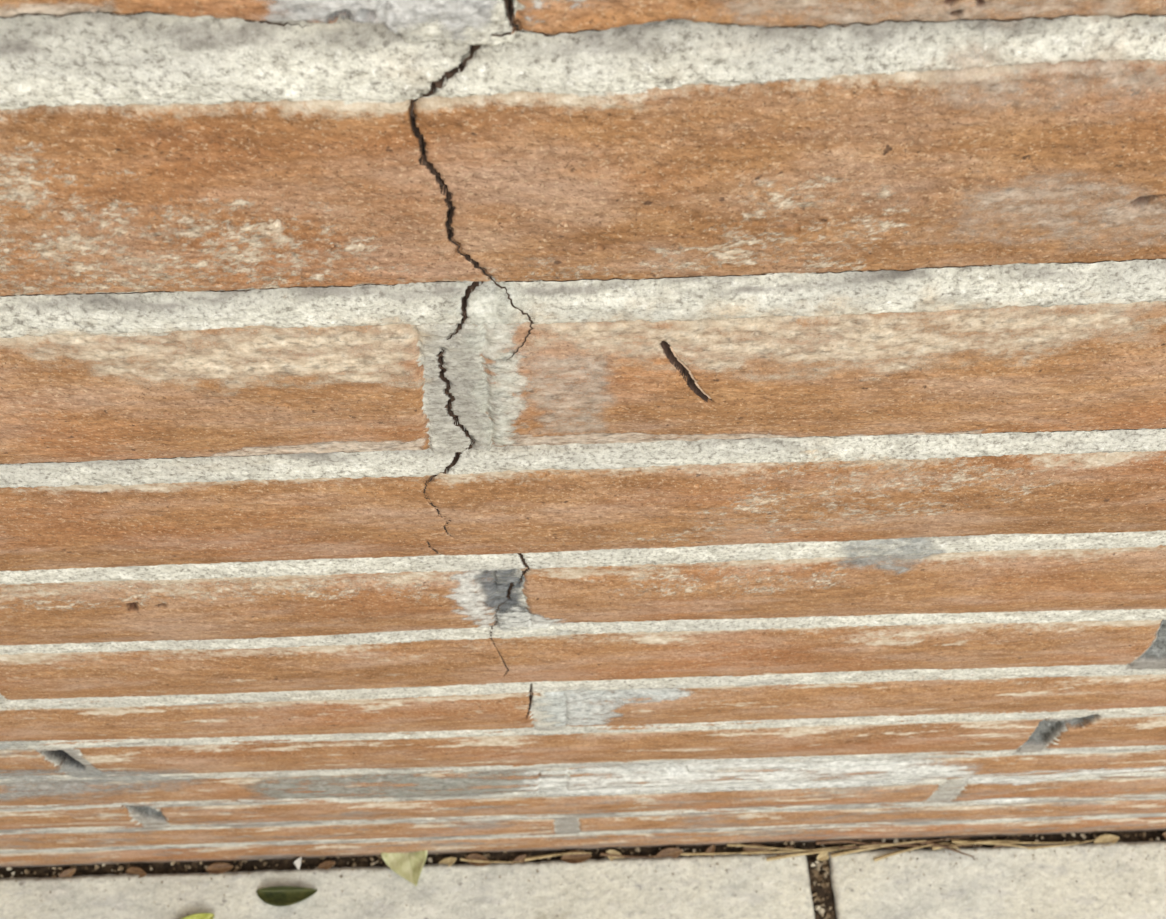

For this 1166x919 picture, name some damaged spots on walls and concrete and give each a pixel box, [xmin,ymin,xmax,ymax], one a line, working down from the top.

crack [707,14,1166,29]
crack [1024,257,1164,265]
crack [813,265,992,274]
crack [206,0,775,555]
crack [1,290,176,298]
crack [489,553,533,717]
peeling [50,750,84,767]
peeling [131,806,165,817]